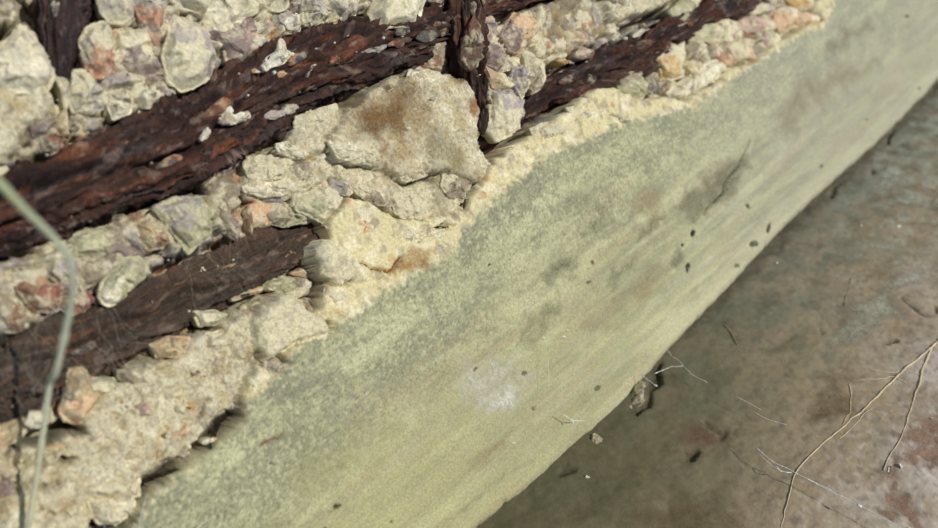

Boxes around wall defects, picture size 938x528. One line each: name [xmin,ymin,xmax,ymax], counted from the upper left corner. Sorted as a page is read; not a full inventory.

corrosion [0,0,551,259]
spalling [0,0,703,341]
corrosion [520,0,764,124]
spalling [609,0,820,102]
corrosion [0,223,320,423]
spalling [0,239,363,528]